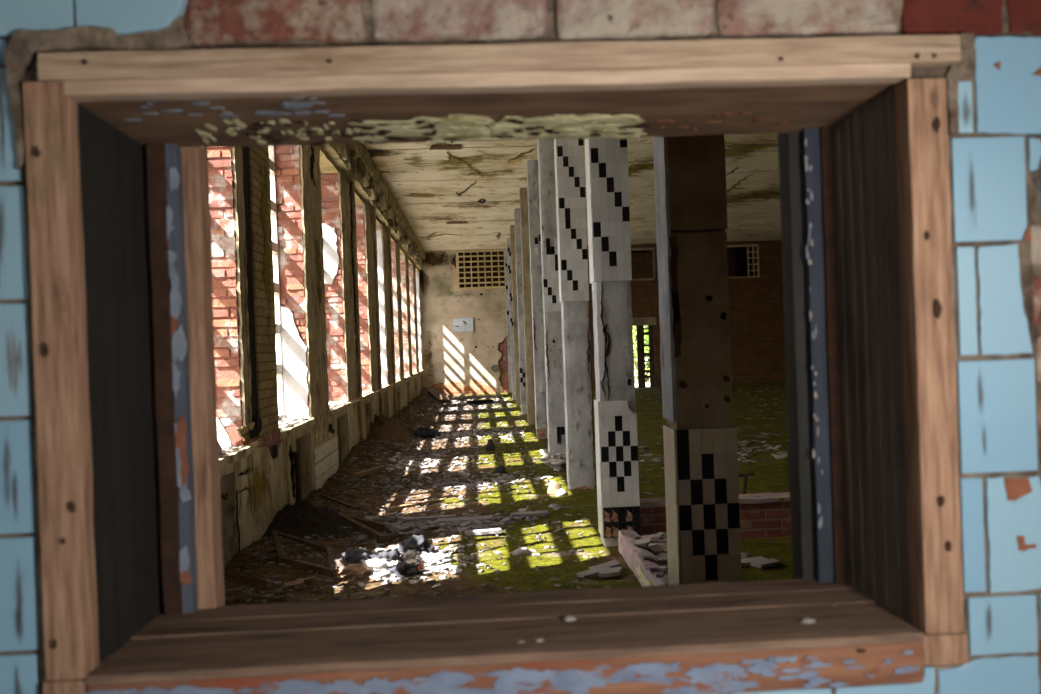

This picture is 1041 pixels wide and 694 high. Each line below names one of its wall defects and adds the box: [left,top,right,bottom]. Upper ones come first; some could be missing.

flaking render [185,0,1041,46]
peeling [122,97,651,268]
leakage [413,202,500,221]
flaking render [1022,223,1041,382]
peeling [82,650,920,694]